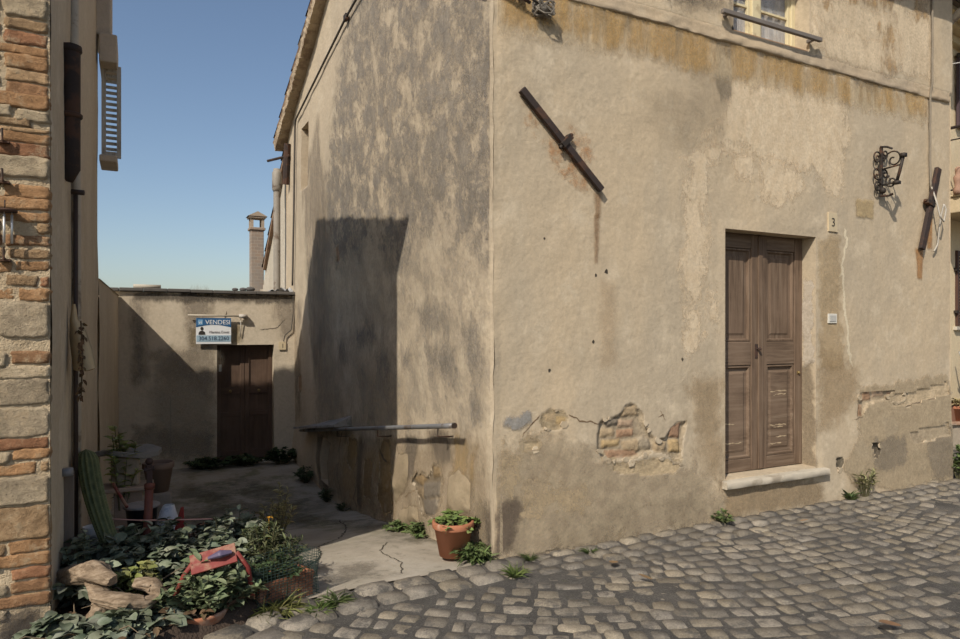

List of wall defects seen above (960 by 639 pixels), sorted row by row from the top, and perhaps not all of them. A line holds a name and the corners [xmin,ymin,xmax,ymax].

leakage [133,0,925,397]
flaking render [377,437,393,515]
flaking render [410,462,445,518]
flaking render [519,408,569,455]
flaking render [596,402,687,478]
peeling [836,374,953,490]